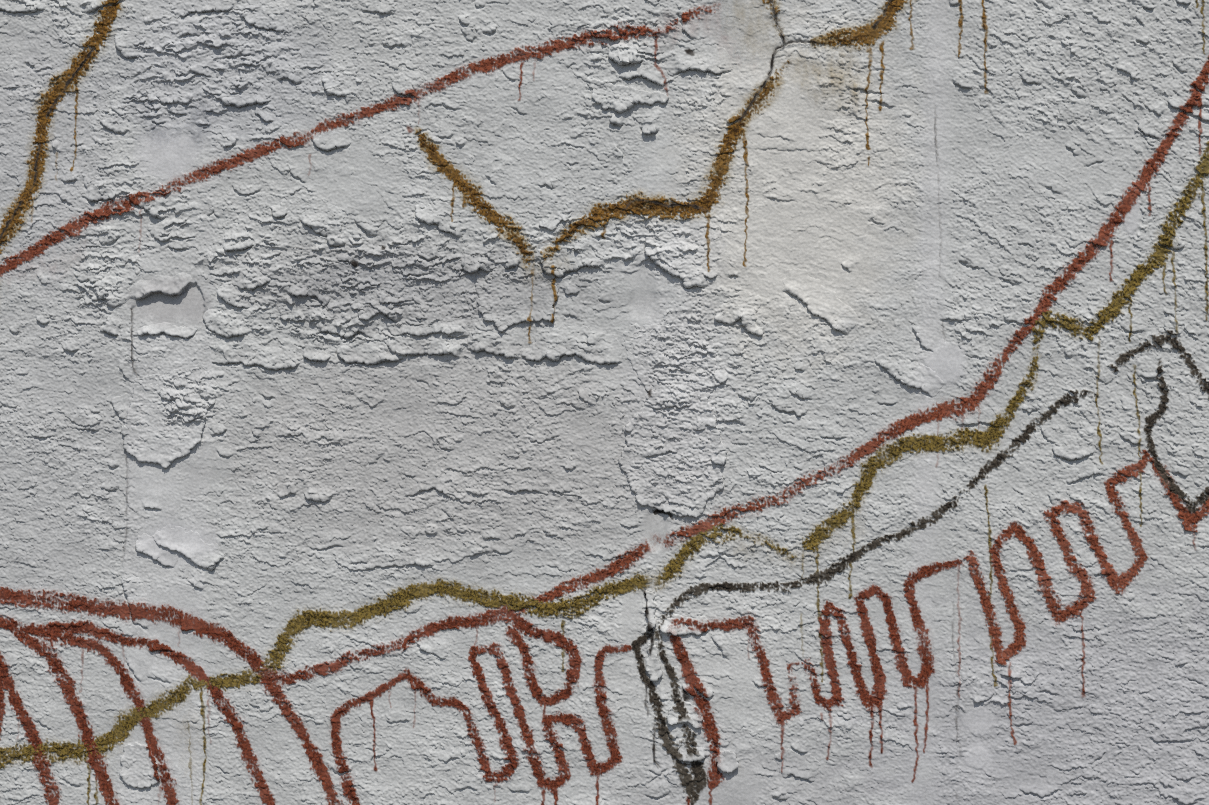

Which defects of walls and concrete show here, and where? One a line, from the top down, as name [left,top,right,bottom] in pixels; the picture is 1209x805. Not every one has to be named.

crack [739,0,817,121]
peeling [129,272,193,300]
peeling [135,524,225,571]
crack [643,590,654,655]
crack [644,684,659,766]